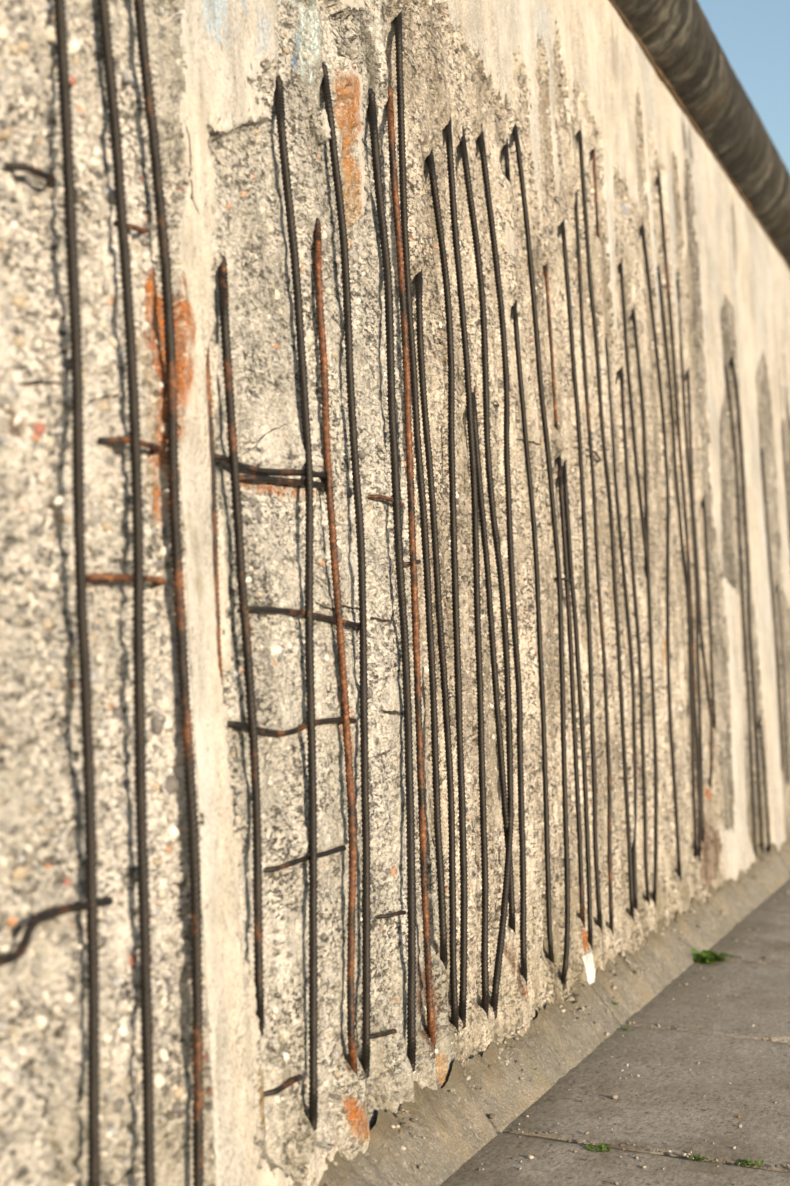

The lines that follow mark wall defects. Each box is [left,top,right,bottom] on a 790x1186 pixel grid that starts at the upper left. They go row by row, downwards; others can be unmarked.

spalling [0,0,216,1186]
rust [145,272,196,519]
rust [338,81,362,205]
spalling [206,0,790,1186]